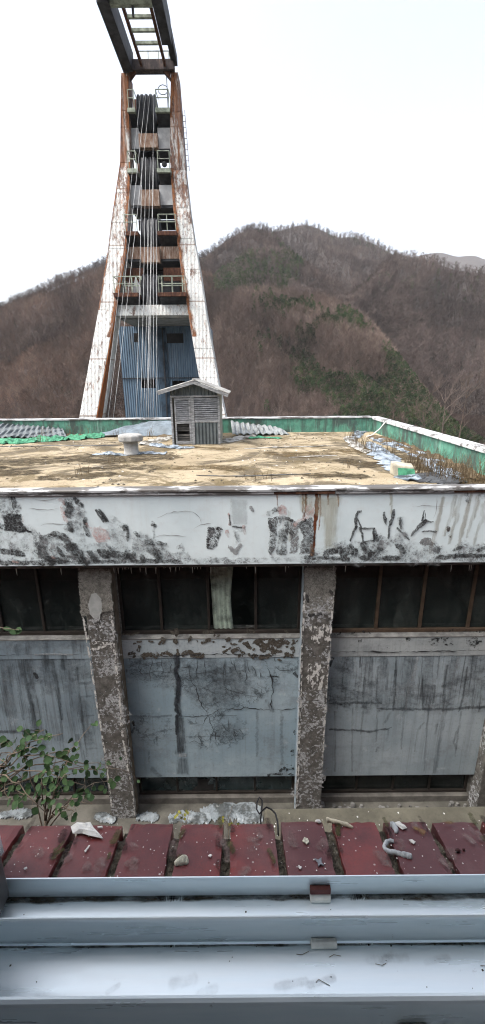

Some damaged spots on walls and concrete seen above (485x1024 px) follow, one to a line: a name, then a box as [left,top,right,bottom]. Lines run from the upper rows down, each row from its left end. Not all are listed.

corrosion [120,76,130,138]
corrosion [98,162,130,337]
corrosion [171,168,196,337]
peeling [225,514,244,555]
corrosion [302,494,339,556]
water stain [174,654,186,765]
peeling [78,566,336,818]
crack [130,653,296,746]
peeling [467,727,485,807]